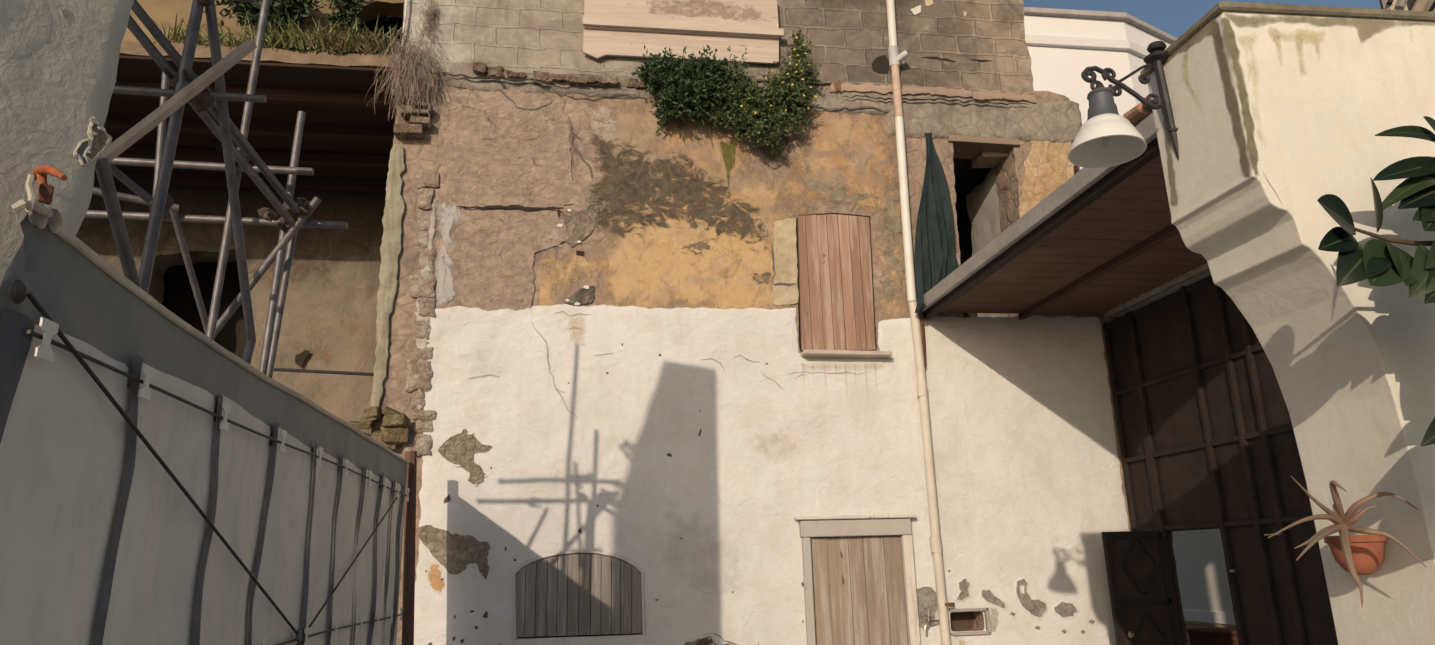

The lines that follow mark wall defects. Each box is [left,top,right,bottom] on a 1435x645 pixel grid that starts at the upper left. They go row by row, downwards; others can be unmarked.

spalling [392,89,434,139]
water stain [1162,14,1434,177]
spalling [416,170,439,231]
water stain [581,135,766,255]
spalling [552,209,594,256]
spalling [565,285,595,305]
peeling [402,249,492,486]
crack [532,311,612,418]
peeling [418,525,516,581]
peeling [916,585,938,630]
peeling [948,570,1095,634]
peeling [680,633,730,645]